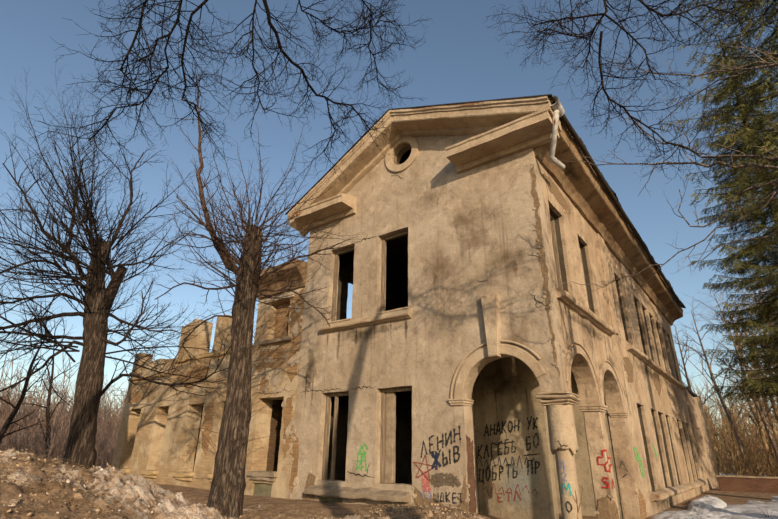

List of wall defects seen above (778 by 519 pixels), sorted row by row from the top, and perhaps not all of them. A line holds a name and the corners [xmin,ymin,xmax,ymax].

spalling [530,163,571,378]
spalling [254,289,305,393]
spalling [281,394,316,501]